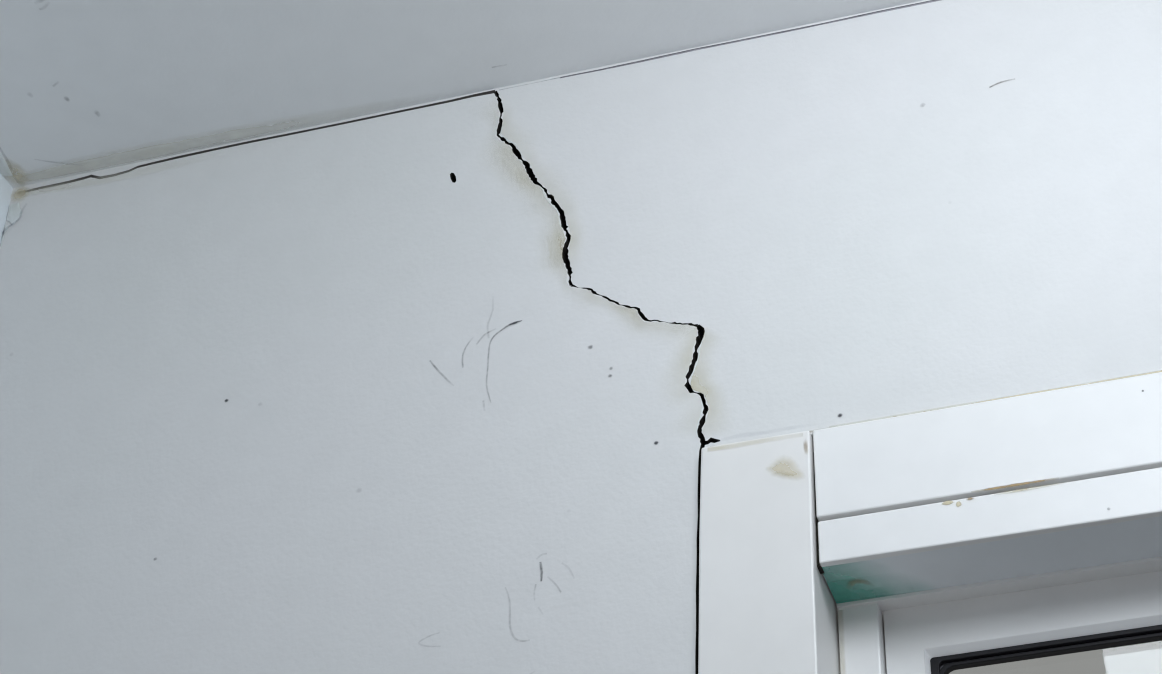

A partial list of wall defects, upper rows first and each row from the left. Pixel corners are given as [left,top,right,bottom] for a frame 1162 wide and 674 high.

crack [17,90,720,674]